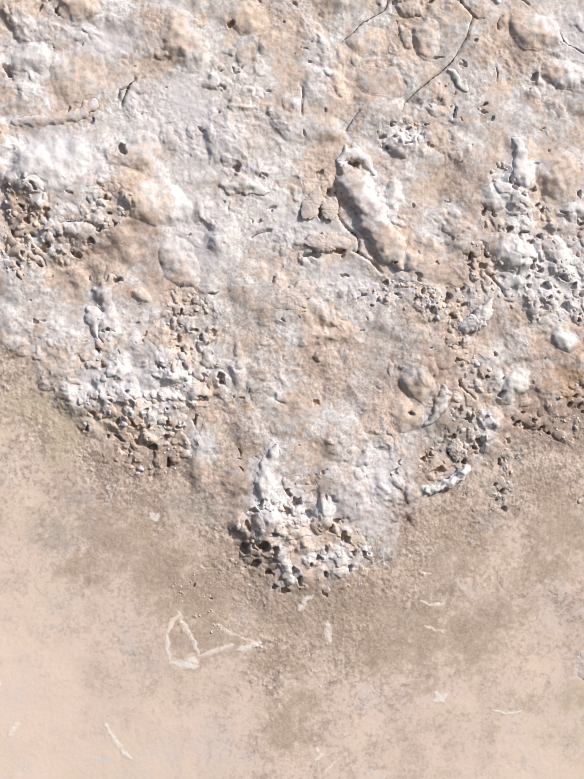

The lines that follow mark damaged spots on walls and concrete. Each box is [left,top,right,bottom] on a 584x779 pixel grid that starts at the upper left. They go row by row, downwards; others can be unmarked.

crack [398,0,477,117]
damp [474,0,511,26]
damp [540,1,584,77]
damp [1,0,351,294]
crack [336,195,380,272]
damp [317,252,412,315]
damp [0,321,584,779]